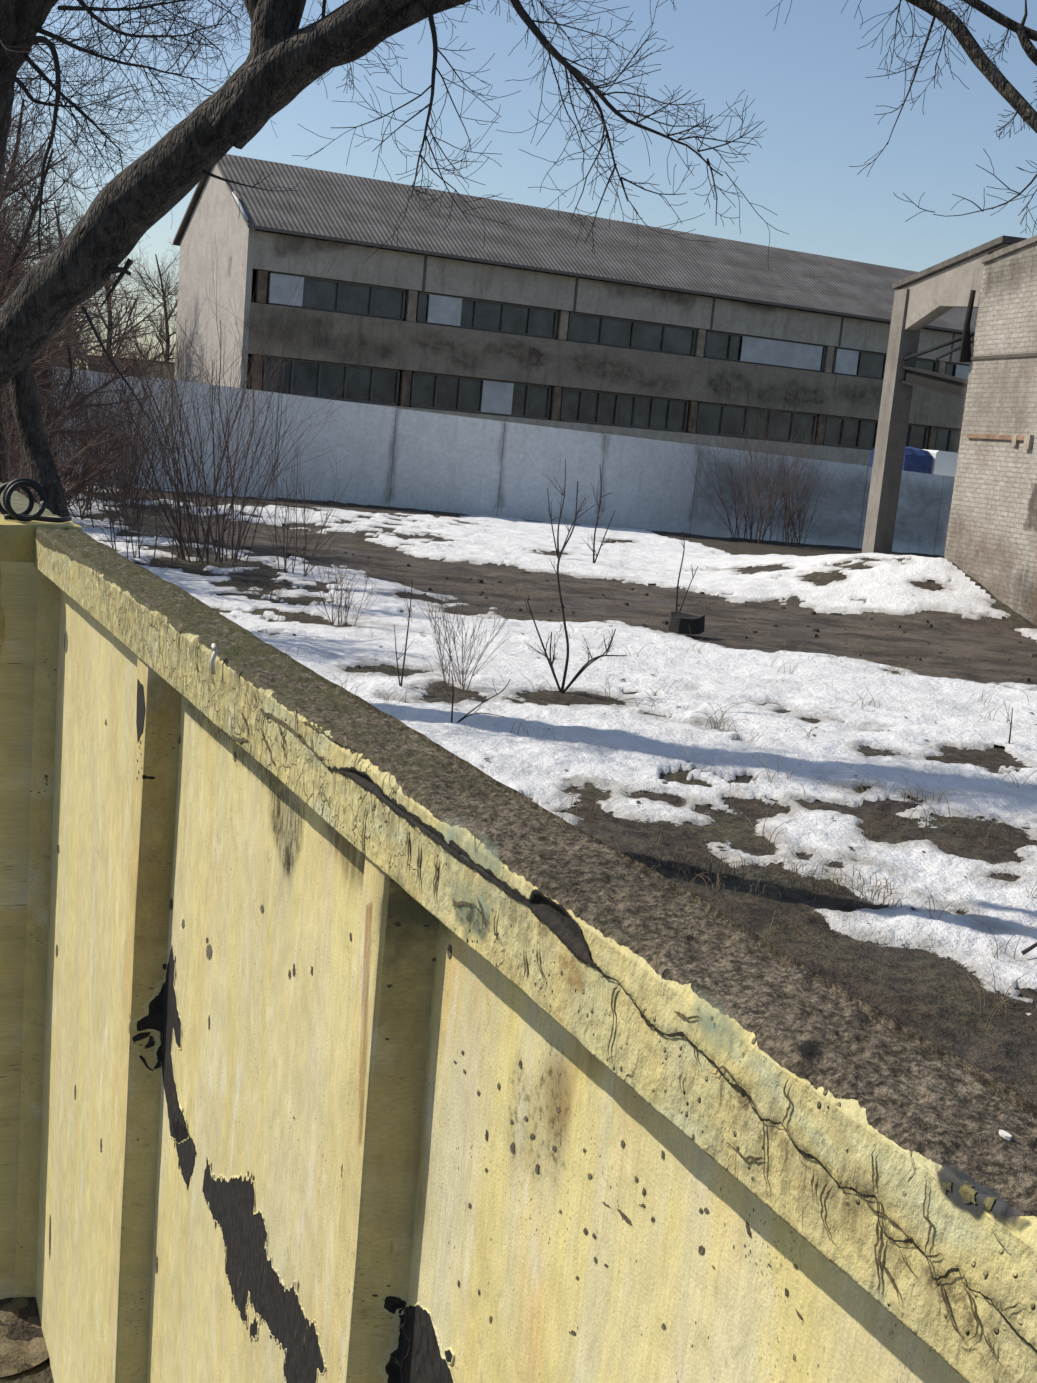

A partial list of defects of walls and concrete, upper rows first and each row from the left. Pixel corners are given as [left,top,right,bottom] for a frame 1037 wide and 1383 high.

spalling [136,679,155,779]
crack [166,625,358,771]
crack [405,802,545,991]
peeling [129,943,327,1383]
crack [586,958,1037,1361]
spalling [936,1164,1021,1225]
peeling [377,1294,455,1383]